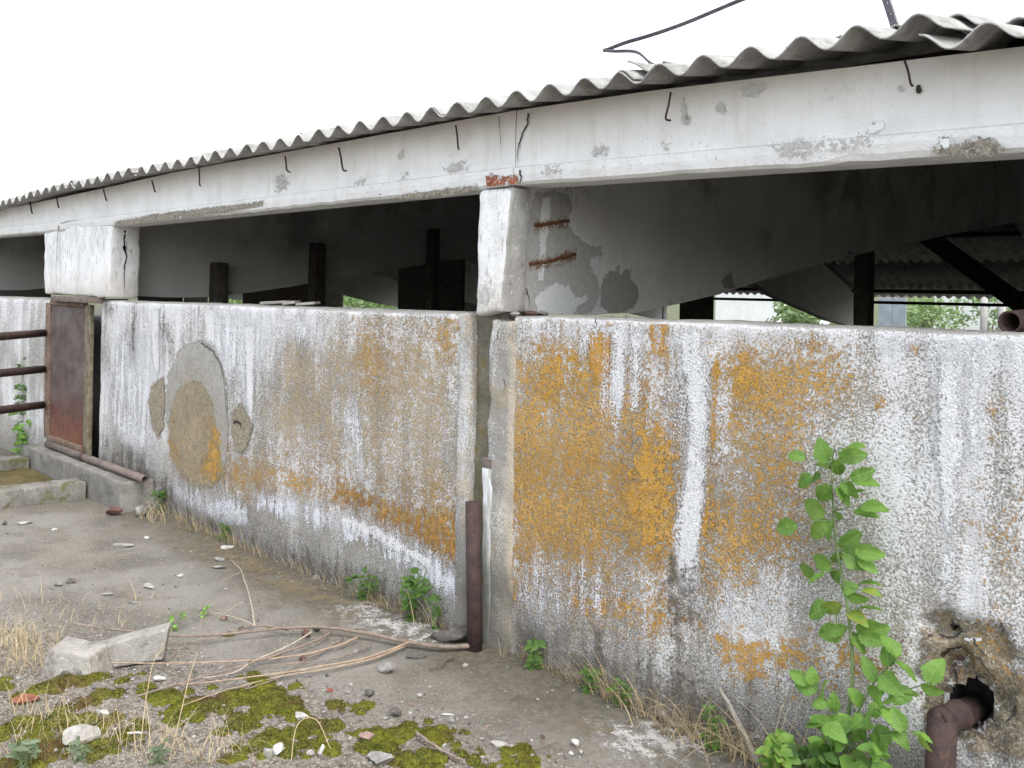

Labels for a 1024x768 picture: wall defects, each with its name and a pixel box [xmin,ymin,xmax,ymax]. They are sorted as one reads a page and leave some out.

crack [499,113,529,182]
spalling [931,135,1006,158]
crack [121,230,129,288]
spalling [114,200,264,226]
spalling [399,172,518,200]
rust [532,215,570,233]
rust [527,250,577,270]
peeling [524,164,639,315]
peeling [147,337,253,500]
damp [102,301,457,646]
damp [512,318,1015,765]
spalling [905,601,1024,768]